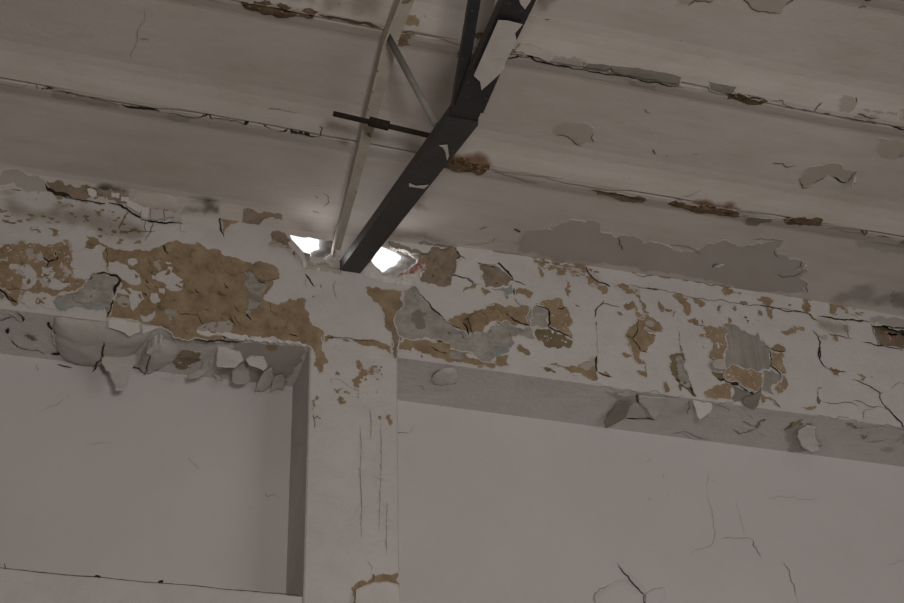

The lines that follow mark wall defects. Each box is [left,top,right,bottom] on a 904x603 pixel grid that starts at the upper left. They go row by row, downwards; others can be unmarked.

peeling [743,0,793,15]
crack [4,83,323,137]
spalling [579,60,682,91]
spalling [708,80,829,114]
peeling [797,162,857,188]
peeling [0,168,824,428]
crack [576,267,623,349]
peeling [829,304,904,347]
crack [632,272,904,430]
crack [596,383,767,434]
peeling [783,405,822,453]
peeling [350,572,402,603]